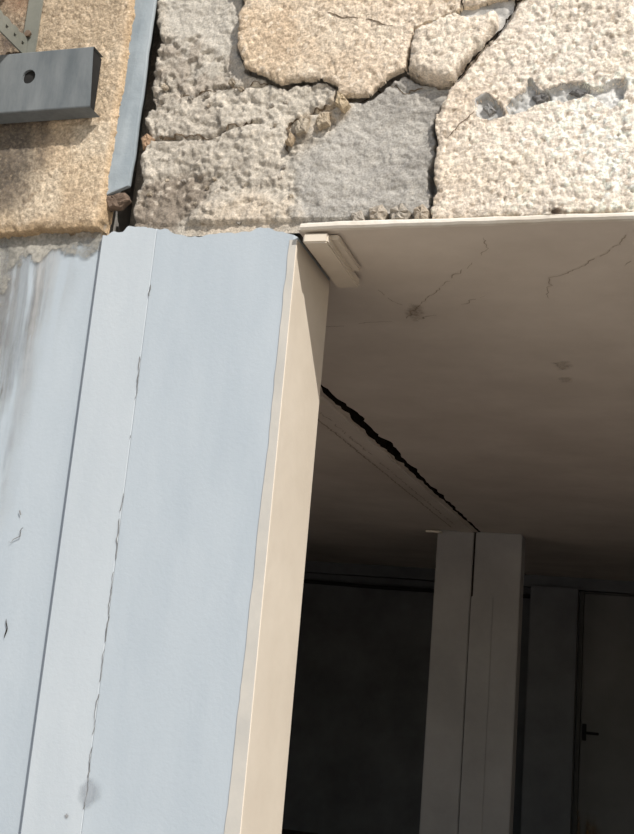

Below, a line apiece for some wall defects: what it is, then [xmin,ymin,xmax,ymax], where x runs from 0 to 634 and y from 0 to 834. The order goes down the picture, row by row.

crack [328,12,393,26]
spalling [457,0,518,35]
crack [457,0,522,80]
spalling [106,0,461,237]
peeling [0,231,102,294]
crack [318,413,455,528]
crack [83,493,124,809]